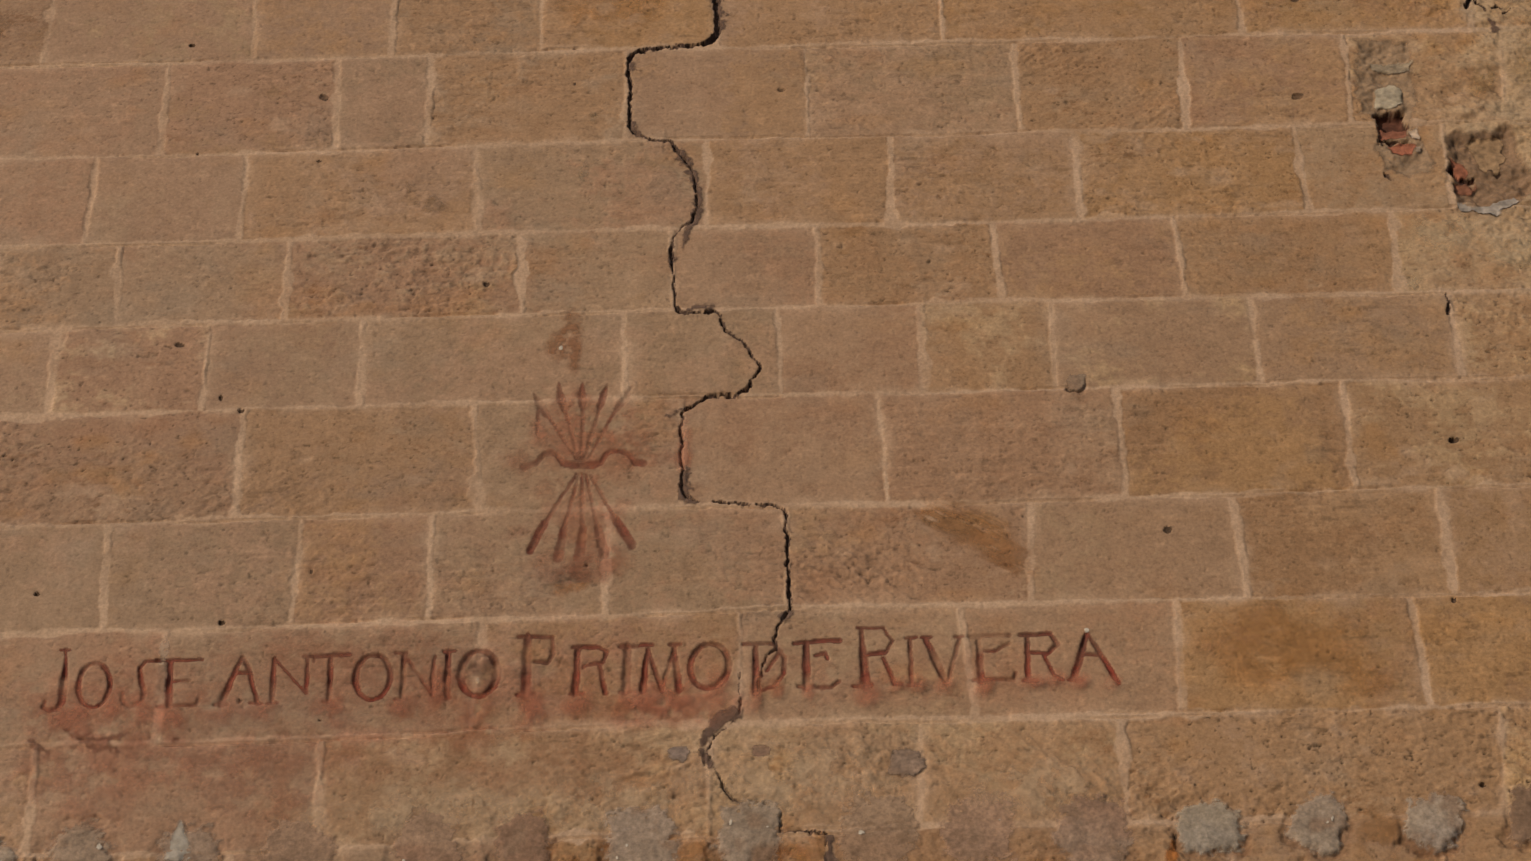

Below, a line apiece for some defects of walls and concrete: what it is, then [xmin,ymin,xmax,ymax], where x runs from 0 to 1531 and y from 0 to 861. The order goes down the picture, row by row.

crack [626,0,838,861]
spalling [1355,39,1531,216]